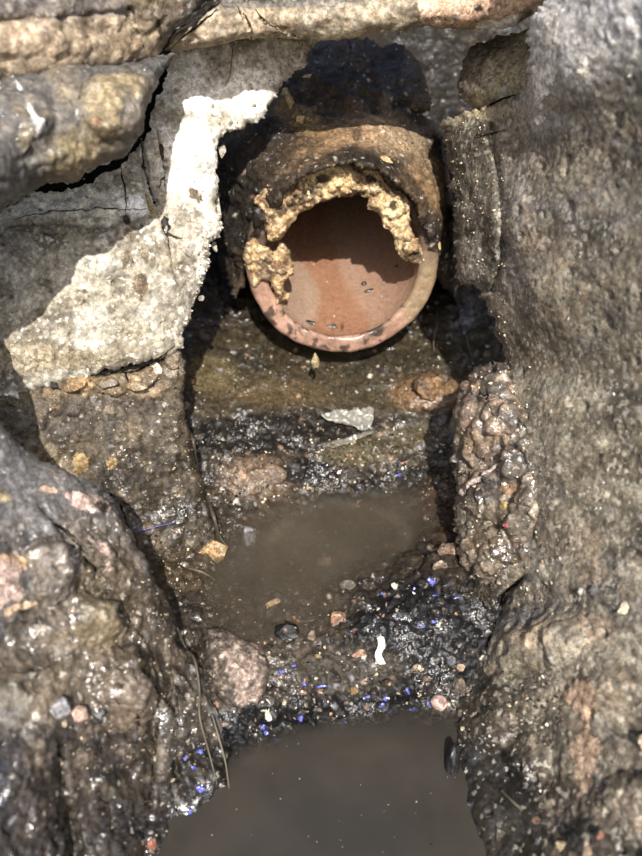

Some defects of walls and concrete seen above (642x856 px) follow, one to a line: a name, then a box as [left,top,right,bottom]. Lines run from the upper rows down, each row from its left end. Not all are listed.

crack [5,0,299,250]
crack [92,345,175,381]
crack [109,493,130,529]
damp [58,735,84,856]
damp [144,711,163,803]